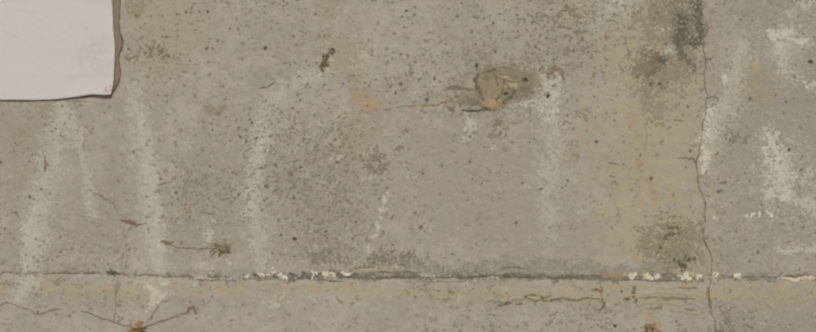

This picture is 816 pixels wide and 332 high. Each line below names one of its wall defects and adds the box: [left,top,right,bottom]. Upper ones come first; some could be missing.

crack [82,189,677,328]
spalling [441,63,533,112]
leakage [257,0,816,332]
crack [667,0,815,332]